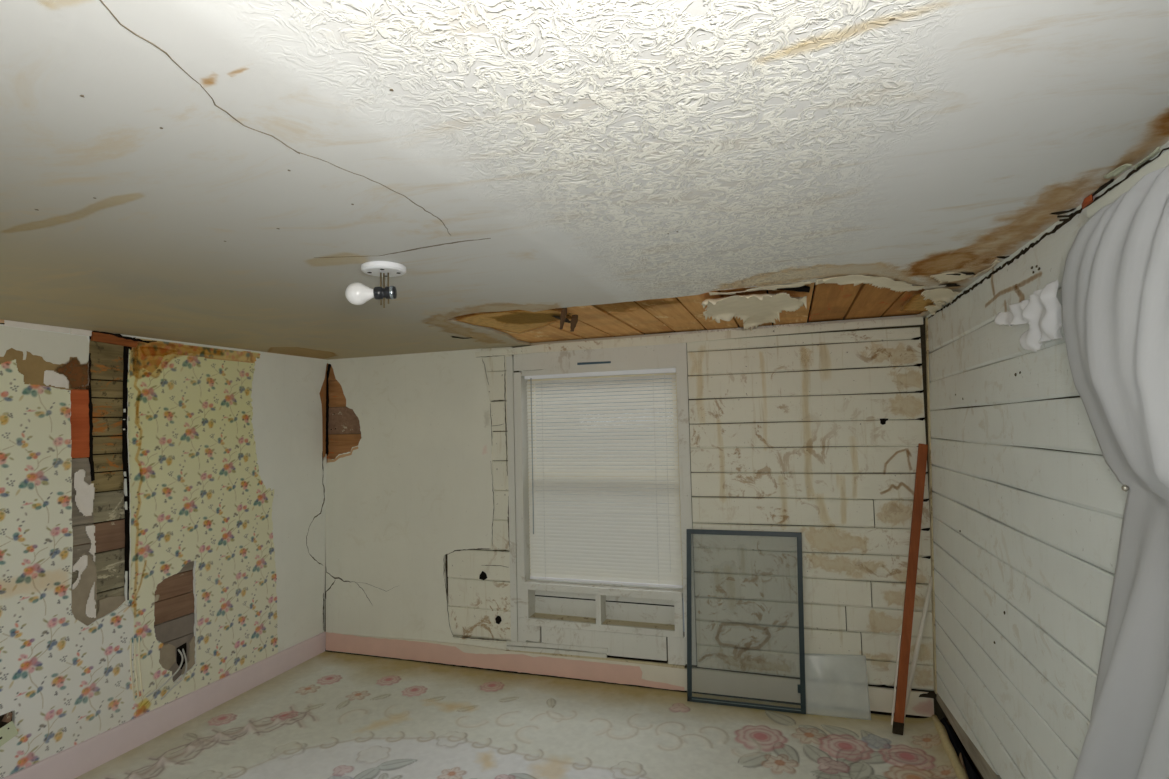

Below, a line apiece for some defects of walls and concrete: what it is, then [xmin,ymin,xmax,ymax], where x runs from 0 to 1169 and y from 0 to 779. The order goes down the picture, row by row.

crack [100,0,491,258]
spalling [44,339,130,626]
spalling [154,561,195,682]
spalling [319,363,361,463]
crack [306,451,391,631]